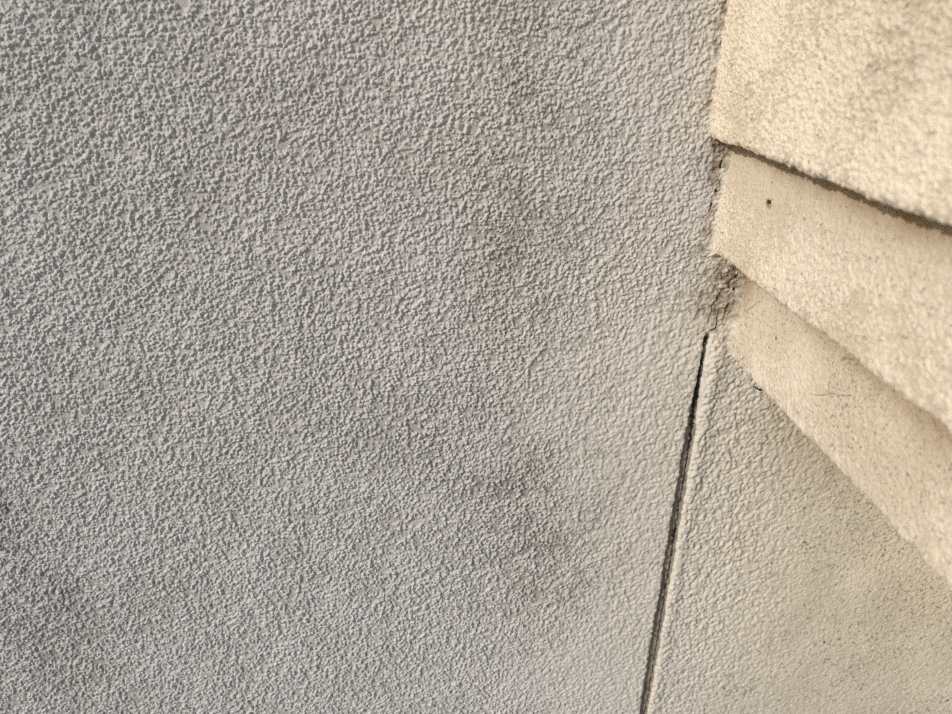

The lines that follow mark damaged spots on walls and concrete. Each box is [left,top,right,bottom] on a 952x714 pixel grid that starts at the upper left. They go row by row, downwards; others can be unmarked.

crack [643,278,754,714]